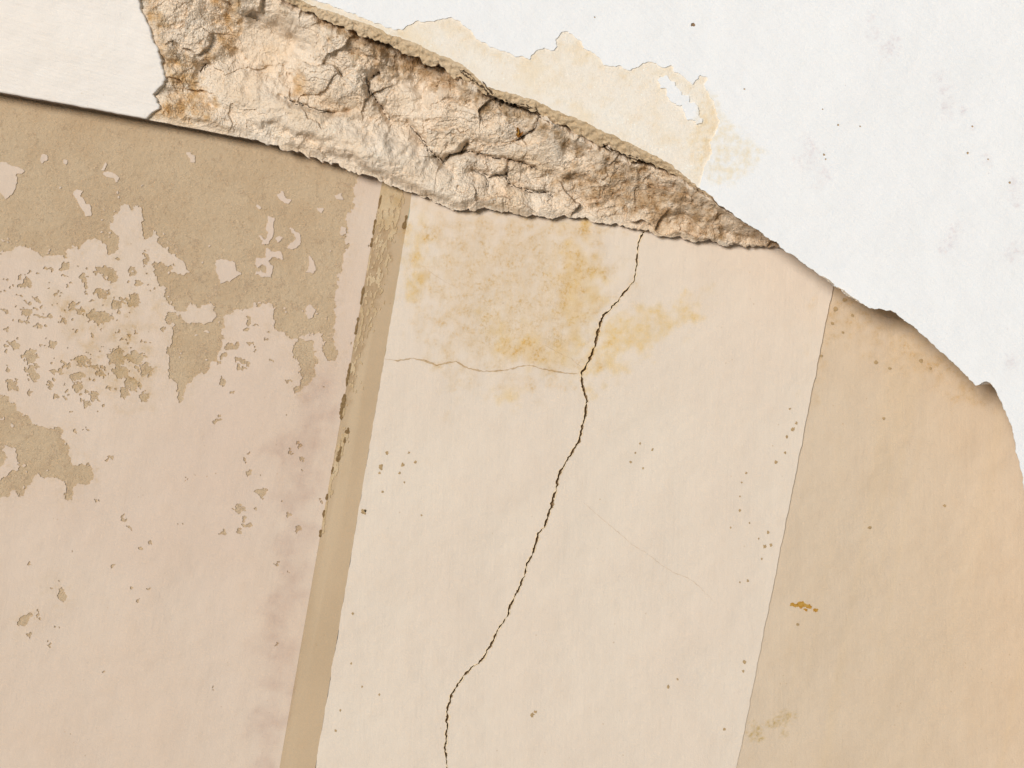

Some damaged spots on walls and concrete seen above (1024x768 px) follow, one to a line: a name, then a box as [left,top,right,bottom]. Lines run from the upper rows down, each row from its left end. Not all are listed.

peeling [17,609,41,638]
flaking render [0,0,798,537]
crack [387,231,646,768]
corrosion [790,601,818,612]